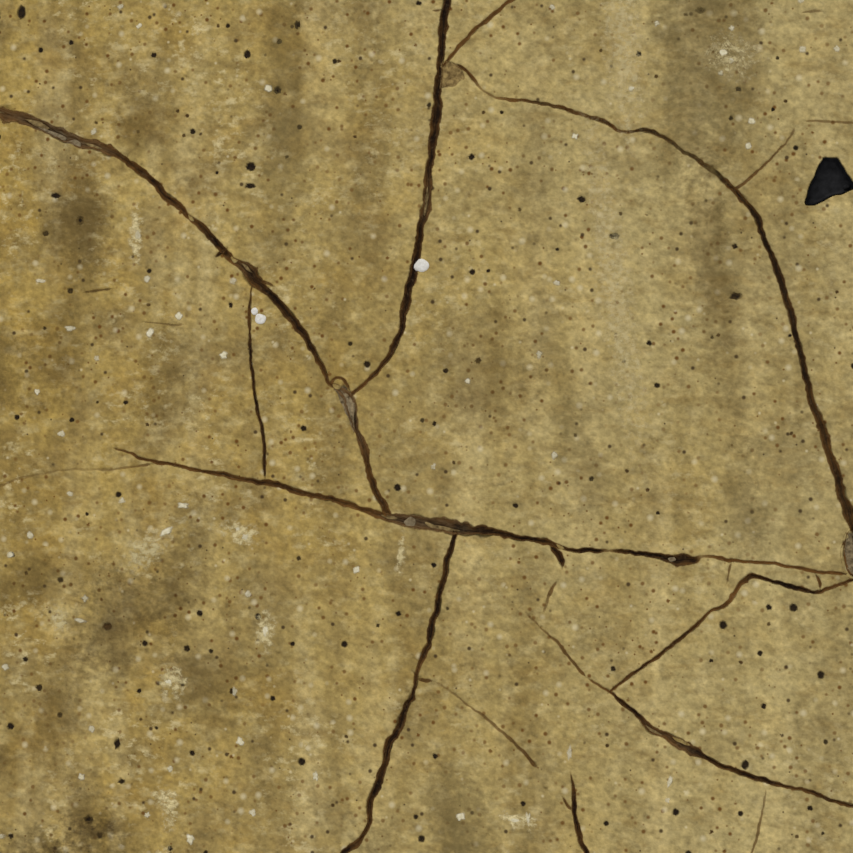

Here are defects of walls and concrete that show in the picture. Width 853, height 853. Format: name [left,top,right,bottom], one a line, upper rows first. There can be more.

spalling [806,158,853,205]
crack [0,0,608,853]
crack [493,96,853,532]
crack [590,549,853,808]
crack [751,820,761,853]